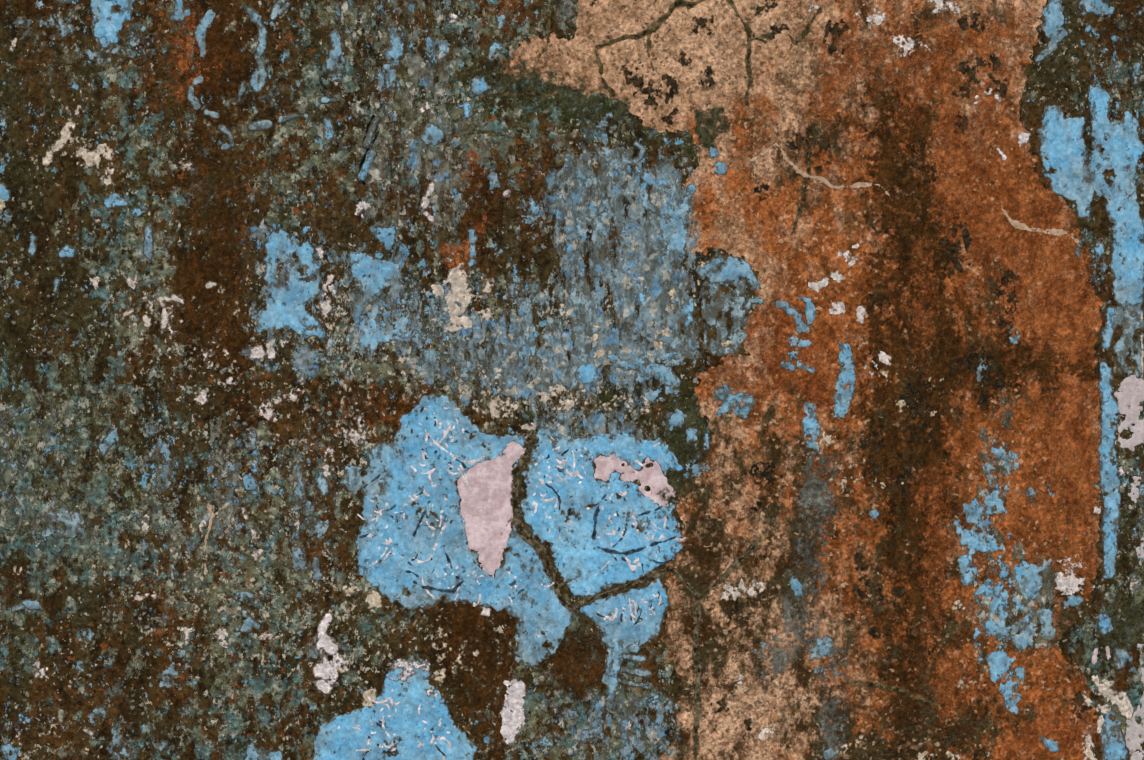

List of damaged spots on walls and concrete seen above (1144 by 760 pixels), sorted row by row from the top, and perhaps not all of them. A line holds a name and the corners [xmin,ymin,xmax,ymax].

rust [166,9,222,98]
crack [453,129,506,137]
crack [479,0,890,235]
rust [812,13,1095,363]
flaking render [286,0,1144,760]
rust [720,290,841,418]
peeling [197,426,259,540]
rust [1021,384,1100,573]
crack [509,430,776,760]
rust [914,466,967,723]
peeling [244,742,283,760]
rust [996,710,1102,760]